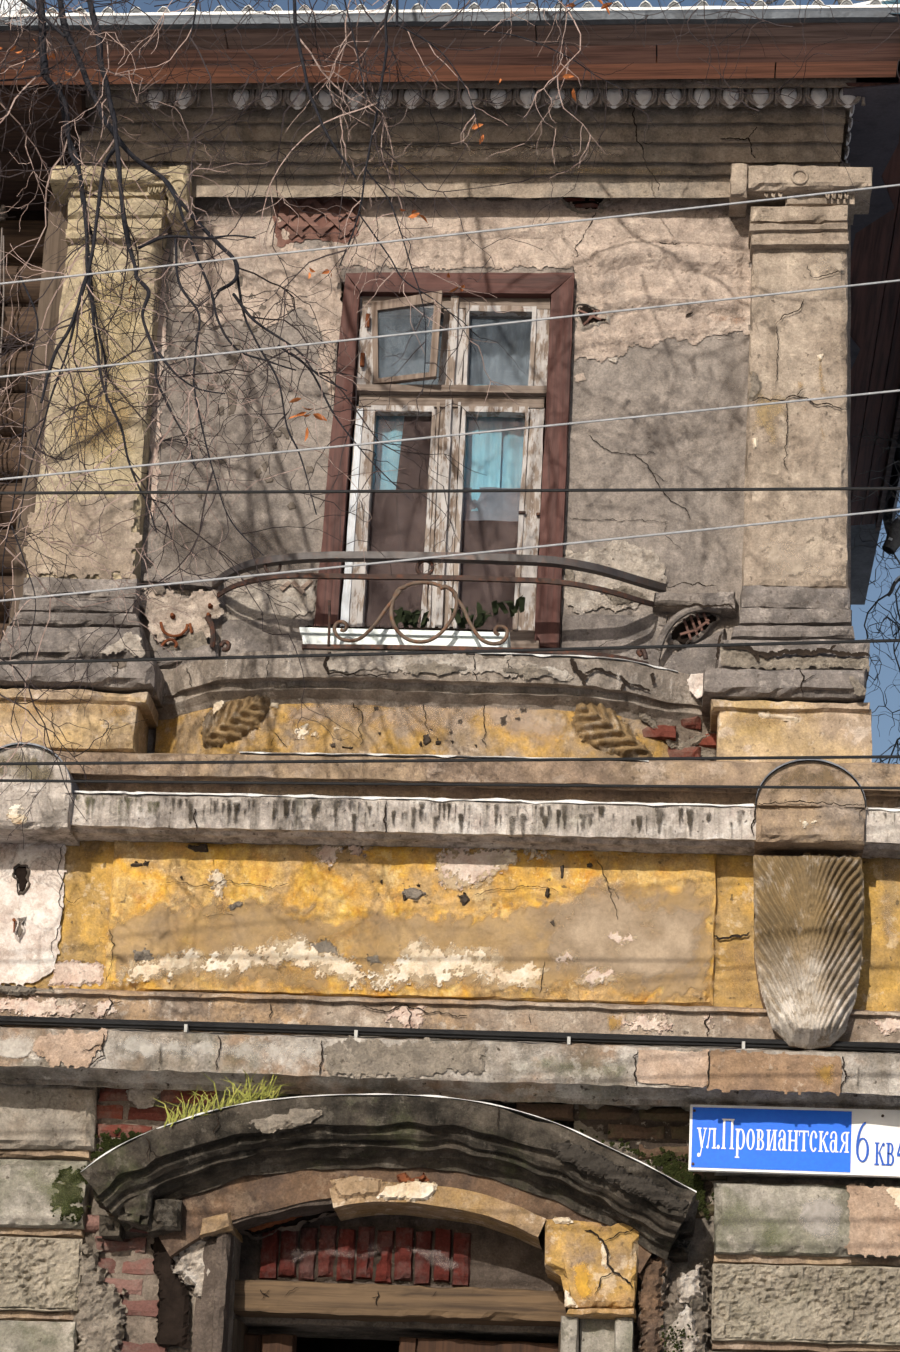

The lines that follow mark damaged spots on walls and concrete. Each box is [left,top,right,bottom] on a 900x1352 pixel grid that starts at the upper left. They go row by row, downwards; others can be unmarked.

peeling [23,196,751,669]
crack [570,435,691,550]
crack [570,639,656,692]
crack [653,582,869,692]
water stain [118,797,465,830]
water stain [479,804,614,836]
crack [596,860,619,919]
peeling [0,843,574,1081]
spalling [249,1108,322,1133]
spalling [238,1172,437,1240]
peeling [801,1183,900,1258]
crack [585,1228,635,1295]